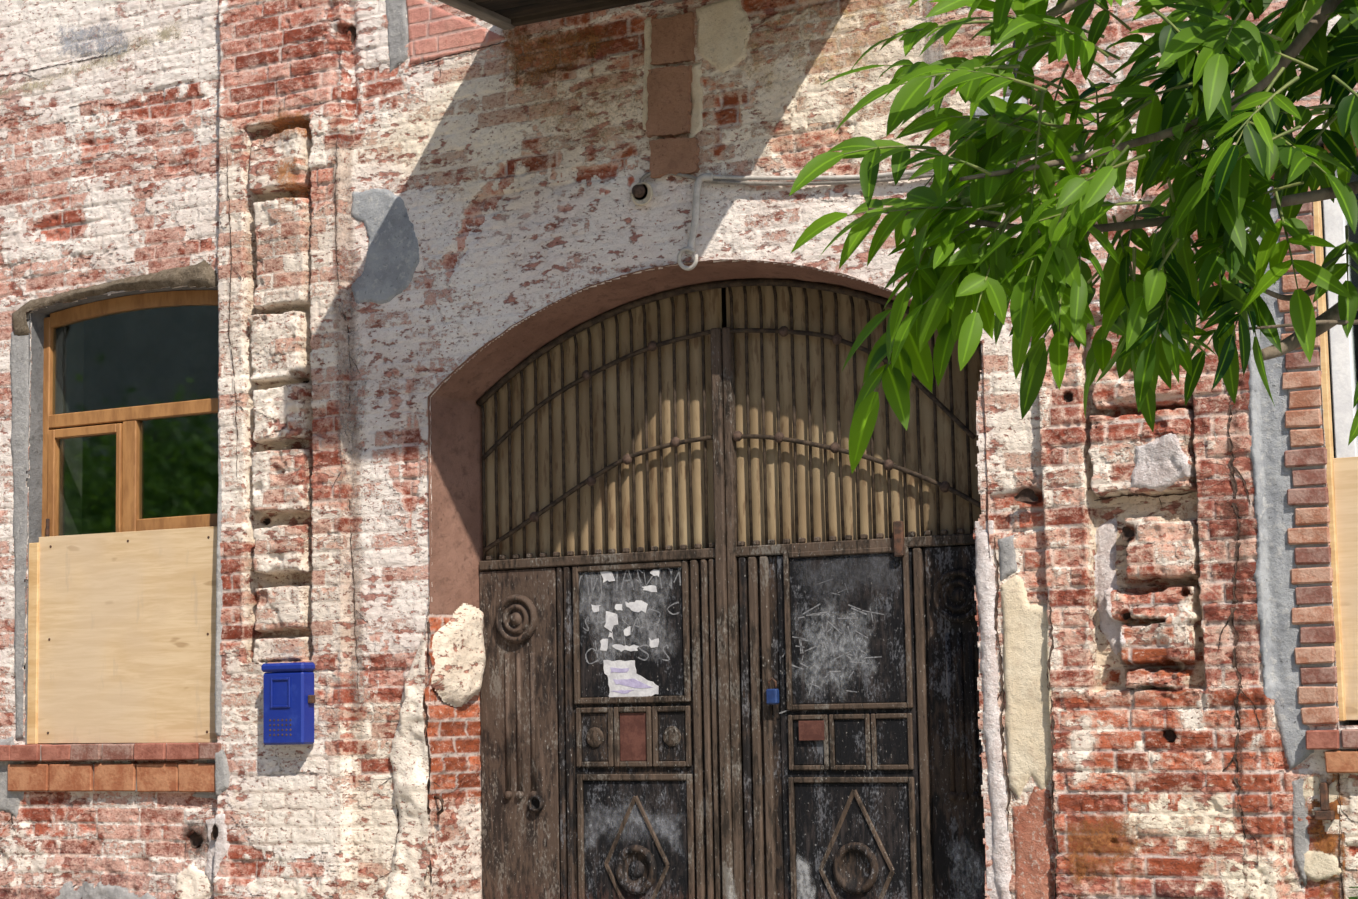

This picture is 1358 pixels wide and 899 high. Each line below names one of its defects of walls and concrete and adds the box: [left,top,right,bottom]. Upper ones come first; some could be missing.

peeling [0,0,424,336]
peeling [419,119,640,323]
spalling [498,3,660,97]
spalling [700,69,863,202]
peeling [190,631,428,899]
rust [1066,817,1139,897]
spalling [973,300,1358,899]
crack [1217,394,1261,874]